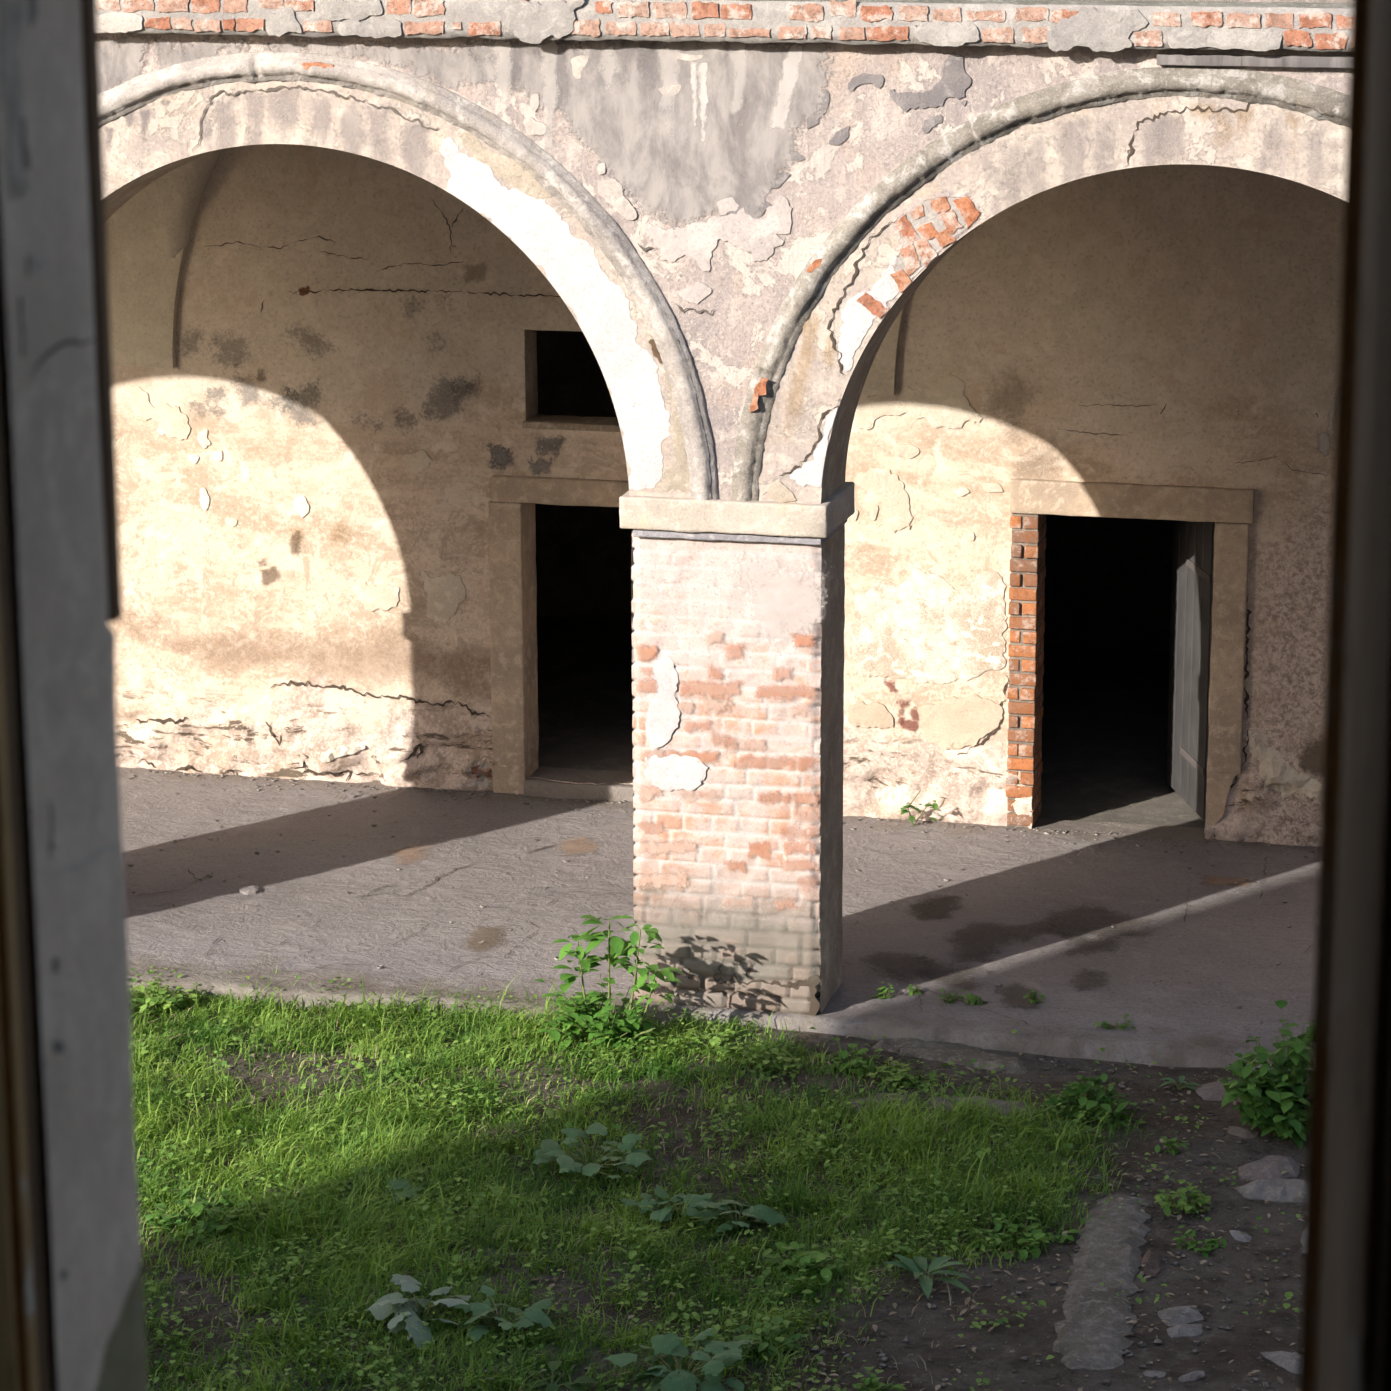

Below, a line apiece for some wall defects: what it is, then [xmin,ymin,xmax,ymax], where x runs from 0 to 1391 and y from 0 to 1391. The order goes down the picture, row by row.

flaking render [97,0,1351,135]
crack [1123,103,1249,168]
flaking render [597,151,805,304]
peeling [439,132,690,492]
spalling [838,190,984,372]
water stain [189,379,319,425]
water stain [353,377,479,427]
peeling [789,407,838,487]
crack [270,680,487,716]
crack [136,717,235,775]
crack [266,722,366,781]
water stain [868,896,1145,1009]